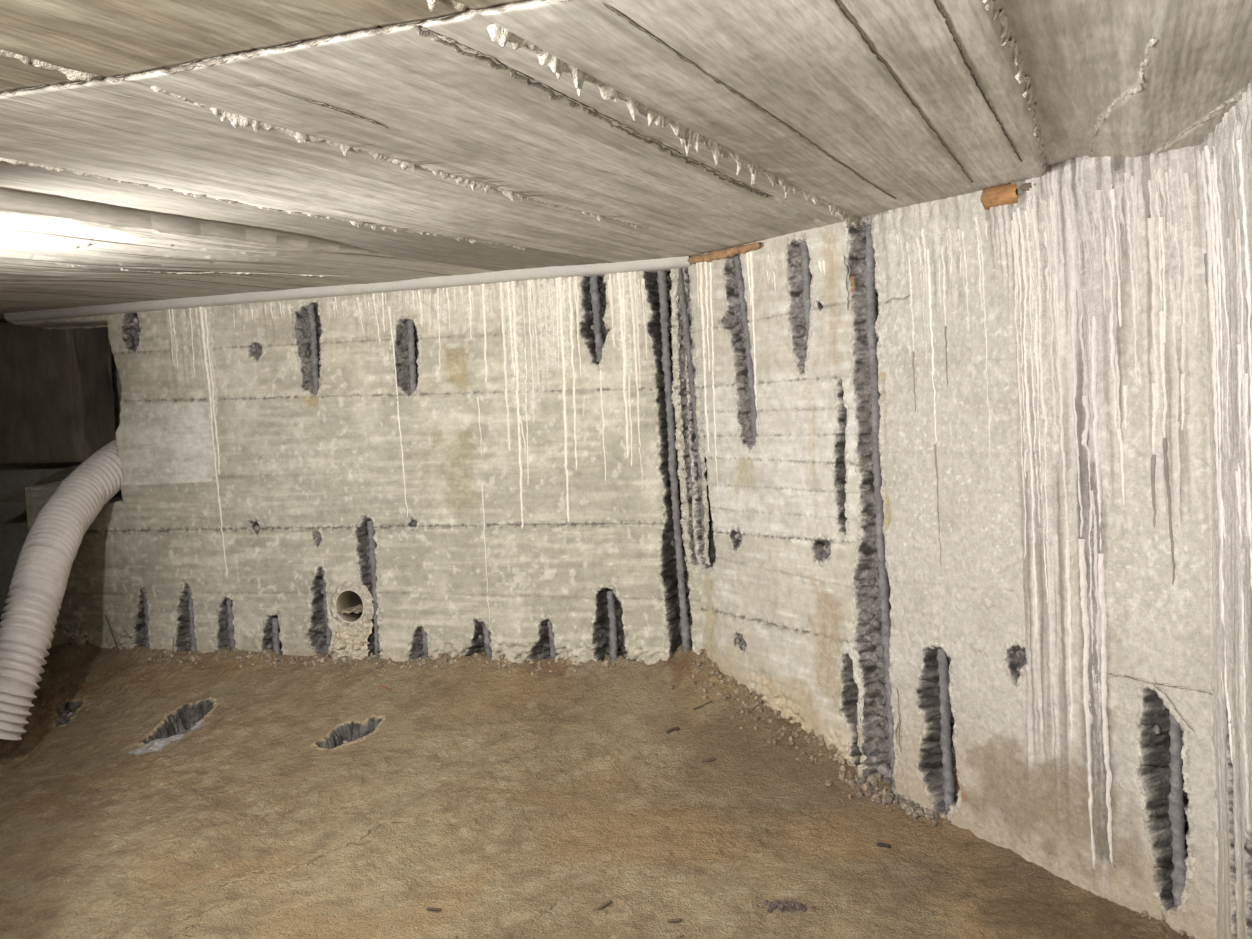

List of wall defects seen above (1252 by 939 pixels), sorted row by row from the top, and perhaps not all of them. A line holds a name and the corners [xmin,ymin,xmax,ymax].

crack [0,0,773,198]
crack [603,3,896,199]
crack [834,0,973,183]
crack [934,0,1023,162]
damp [405,276,585,529]
damp [607,272,647,489]
spalling [640,267,747,661]
spalling [809,217,899,795]
damp [888,217,992,564]
damp [971,113,1252,870]
spalling [913,640,963,819]
spalling [1133,682,1196,917]